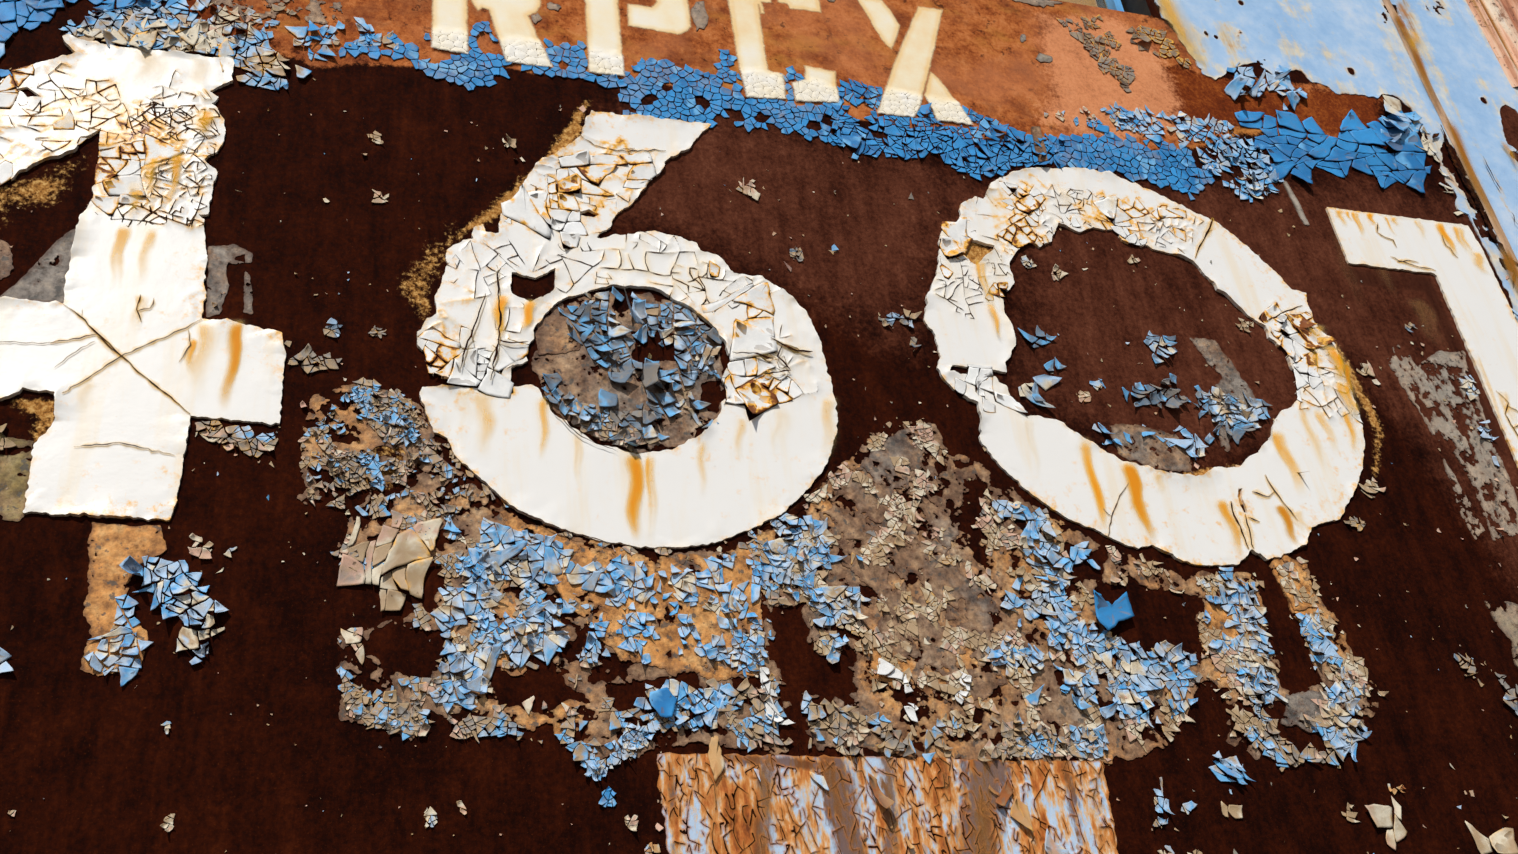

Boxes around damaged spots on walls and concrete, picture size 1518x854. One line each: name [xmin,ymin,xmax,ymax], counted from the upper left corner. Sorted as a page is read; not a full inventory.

corrosion [1396,15,1431,91]
corrosion [1479,0,1511,58]
crack [0,63,220,227]
corrosion [1449,123,1489,207]
corrosion [1437,224,1482,265]
crack [3,294,201,414]
crack [447,240,740,380]
peeling [419,277,803,453]
crack [734,325,813,374]
peeling [0,423,34,522]
peeling [80,522,237,687]
peeling [284,318,1389,854]